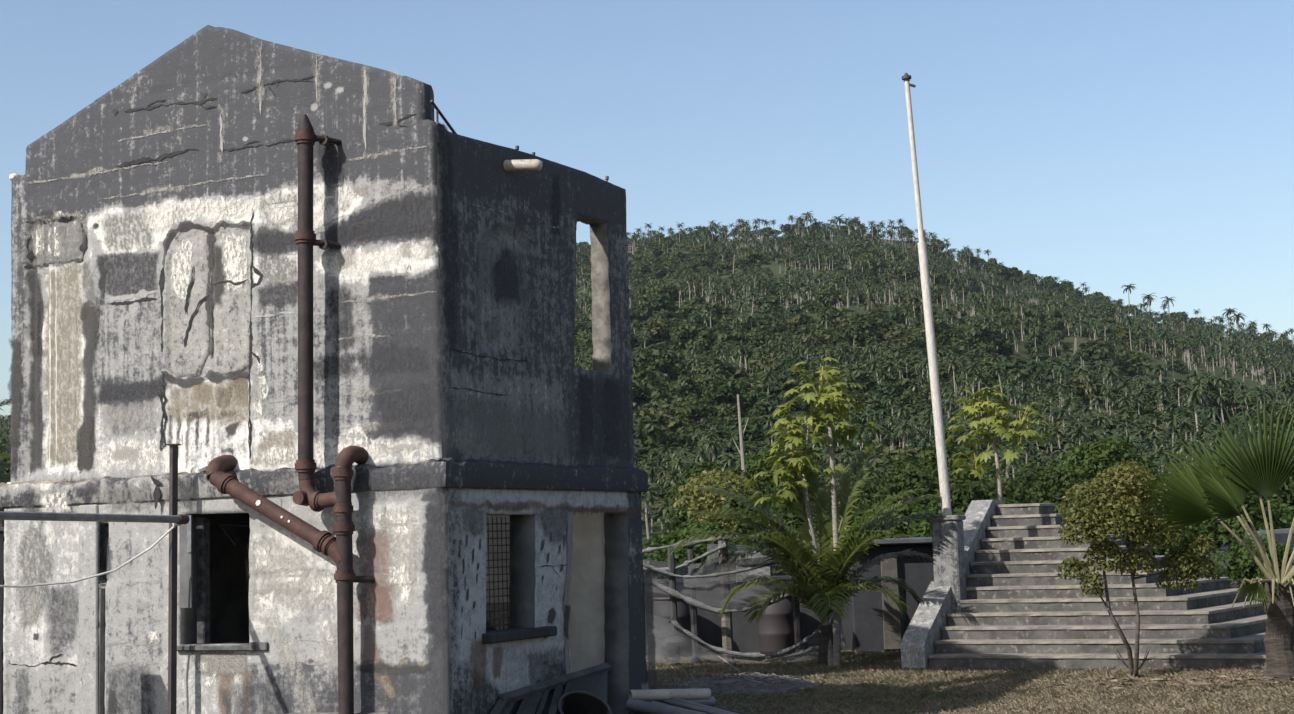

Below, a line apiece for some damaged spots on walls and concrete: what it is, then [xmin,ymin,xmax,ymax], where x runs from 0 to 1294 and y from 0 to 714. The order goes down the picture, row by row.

leakage [255,231,298,256]
leakage [329,124,470,352]
leakage [97,252,158,304]
leakage [258,282,298,306]
crack [151,198,263,509]
leakage [313,287,435,433]
leakage [98,376,166,439]
leakage [318,619,338,673]